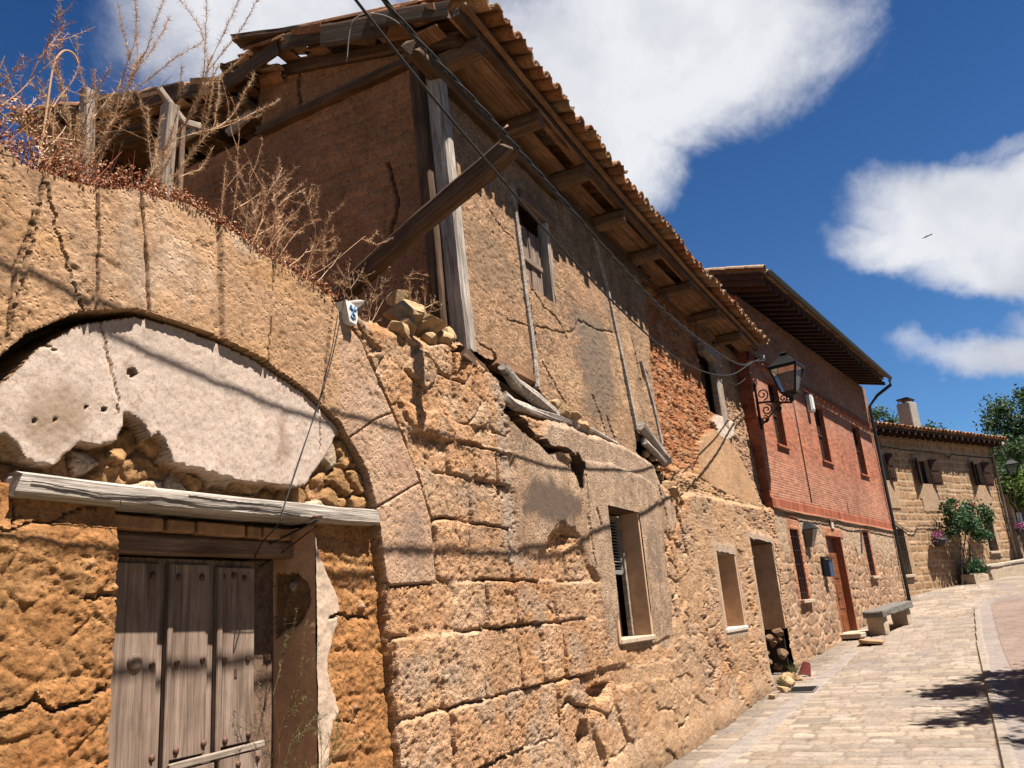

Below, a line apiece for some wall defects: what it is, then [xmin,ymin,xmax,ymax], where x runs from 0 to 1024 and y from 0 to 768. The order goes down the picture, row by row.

crack [0,181,374,497]
spalling [0,413,380,517]
crack [504,410,603,569]
crack [507,264,655,404]
peeling [641,269,765,507]